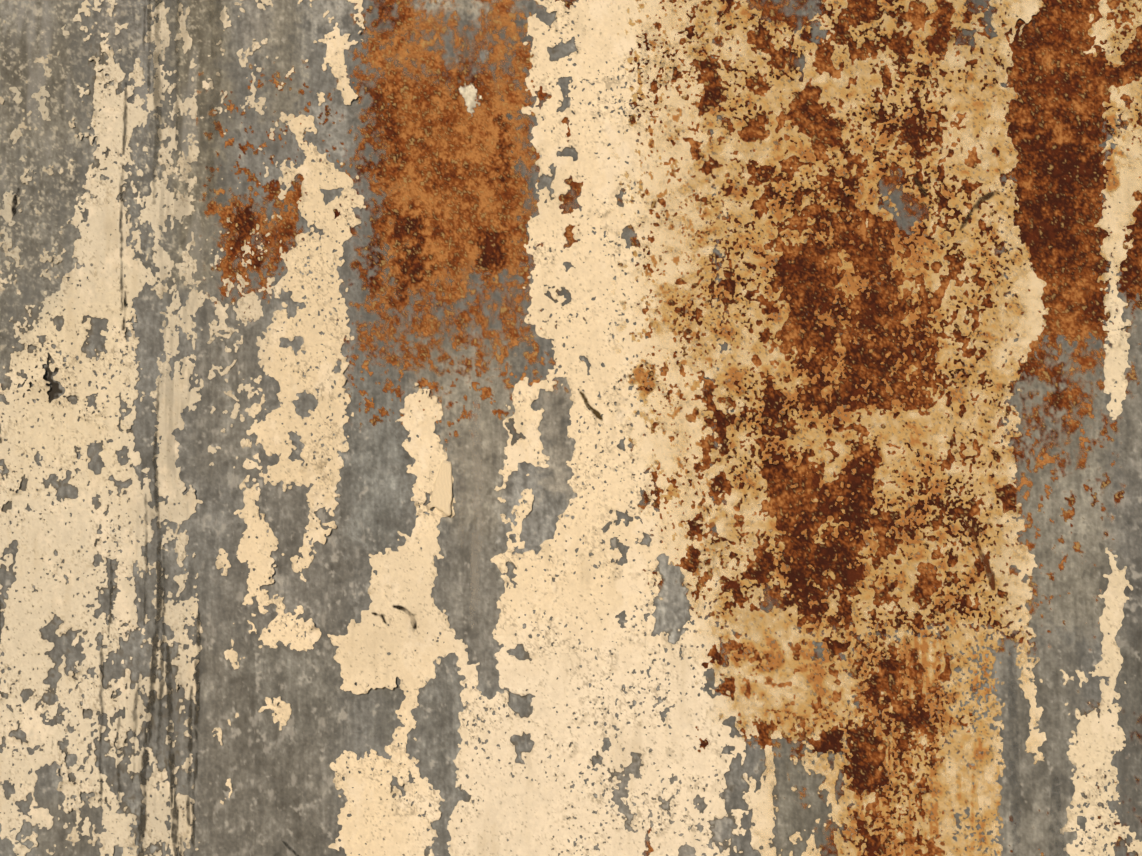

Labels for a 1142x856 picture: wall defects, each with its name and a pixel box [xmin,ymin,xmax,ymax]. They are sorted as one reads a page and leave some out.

peeling [952,0,1017,51]
peeling [1099,101,1138,164]
corrosion [196,0,568,441]
corrosion [559,177,583,247]
peeling [878,161,942,240]
peeling [0,0,860,856]
corrosion [617,0,1142,856]